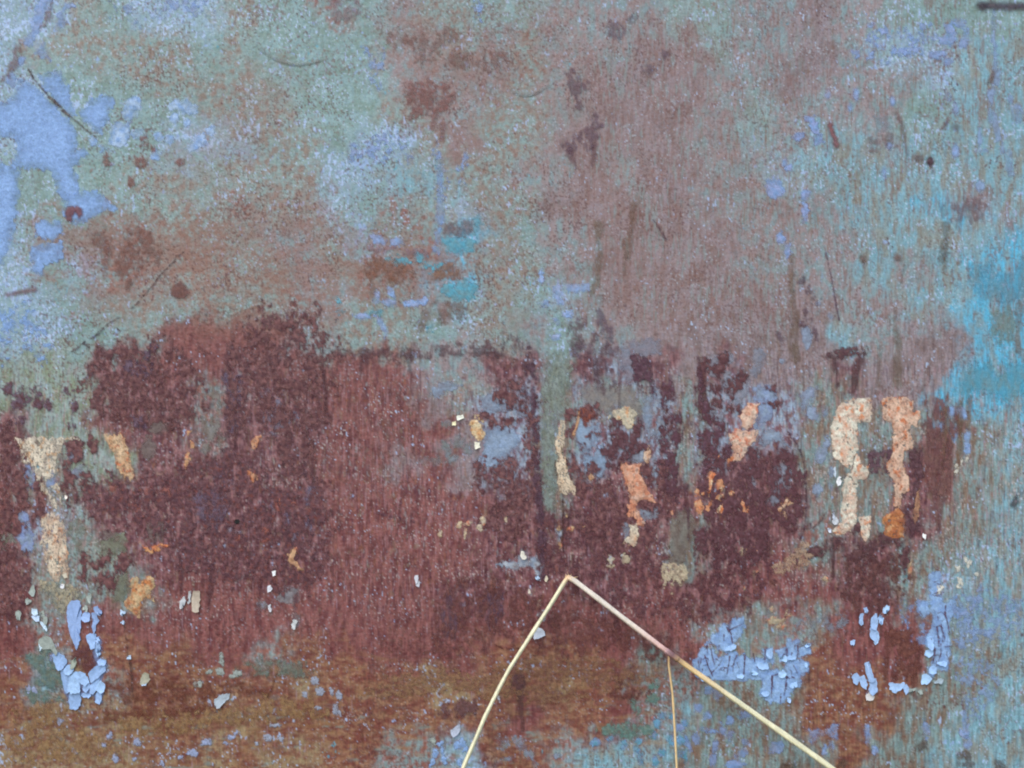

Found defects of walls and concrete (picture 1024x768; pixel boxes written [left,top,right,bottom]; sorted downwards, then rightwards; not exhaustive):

rust [826,346,866,394]
rust [0,381,52,639]
rust [58,299,342,616]
rust [358,346,807,731]
rust [789,394,960,617]
peeling [15,585,107,726]
rust [71,644,96,674]
rust [104,680,270,722]
peeling [178,730,238,759]
peeling [591,617,811,768]
peeling [817,605,890,645]
peeling [851,557,1022,748]